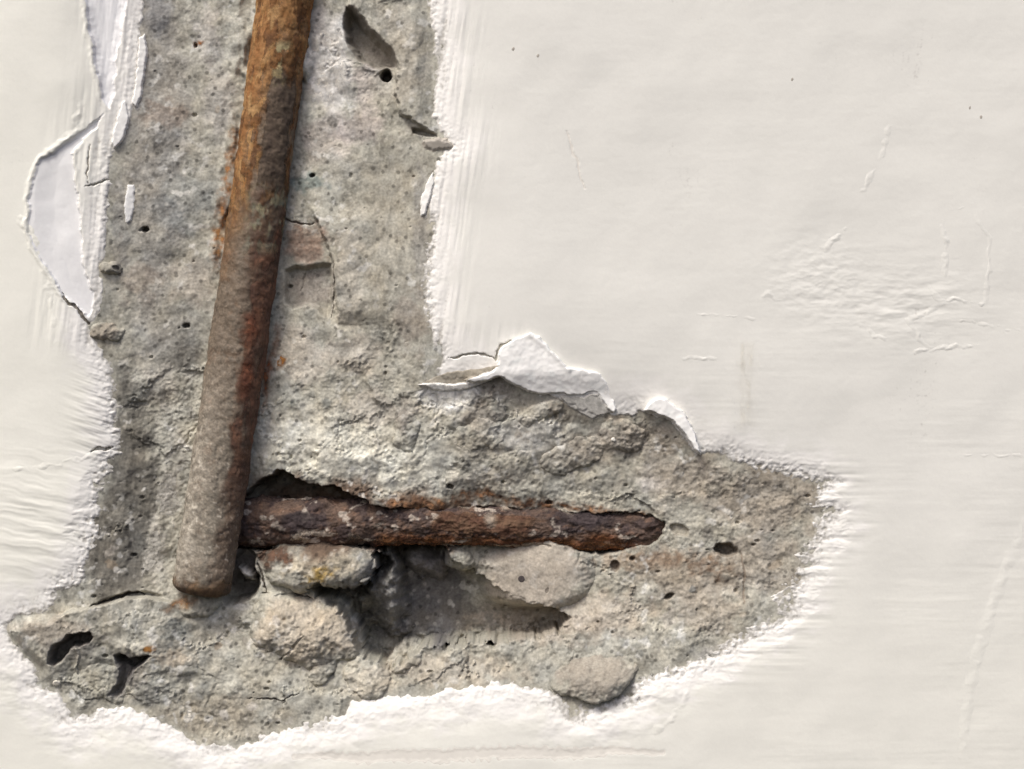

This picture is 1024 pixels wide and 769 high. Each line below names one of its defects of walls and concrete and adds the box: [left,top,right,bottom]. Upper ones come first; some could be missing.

rust [213,0,314,260]
rust [227,193,286,484]
rust [257,546,293,570]
spalling [7,0,835,749]
rust [389,488,616,513]
rust [379,535,628,551]